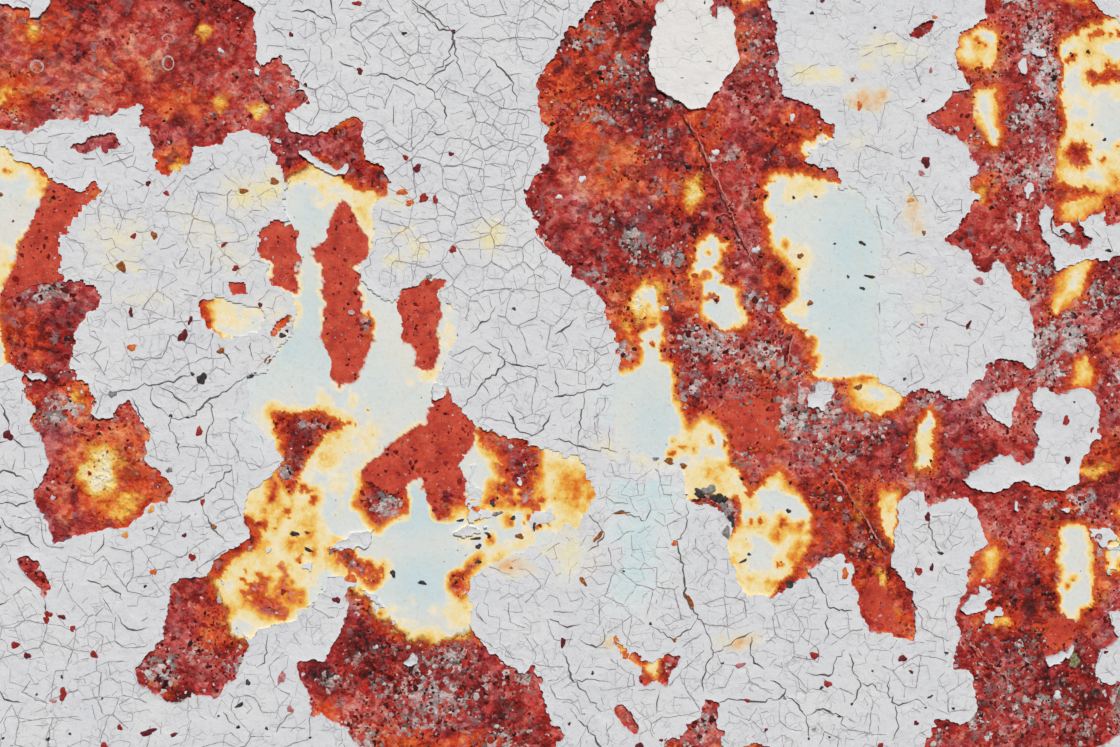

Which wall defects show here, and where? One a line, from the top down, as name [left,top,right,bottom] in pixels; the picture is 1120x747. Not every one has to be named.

peeling [0,0,730,747]
corrosion [396,189,438,206]
crack [258,0,975,747]
peeling [523,0,1120,747]
crack [791,0,1034,392]
corrosion [918,157,930,176]